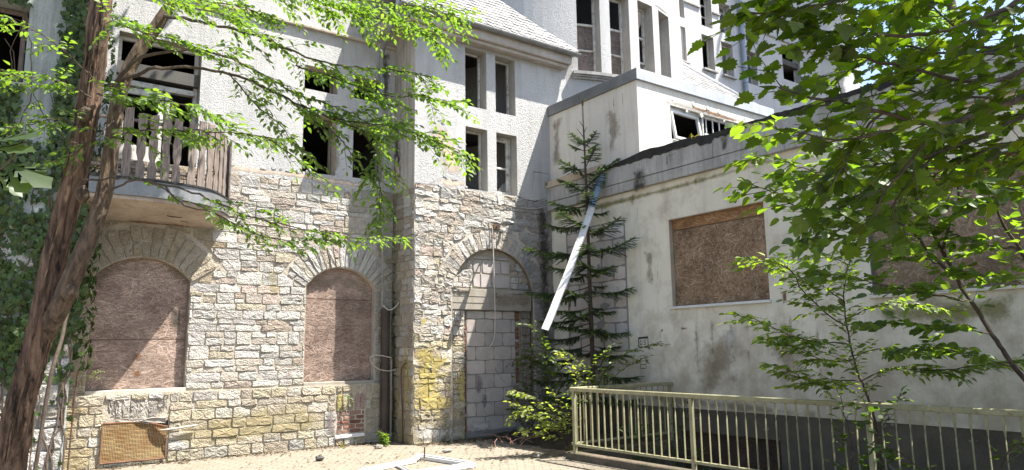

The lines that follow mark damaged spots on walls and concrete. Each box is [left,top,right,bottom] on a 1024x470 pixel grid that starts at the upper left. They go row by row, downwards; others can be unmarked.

flaking render [334,392,365,439]